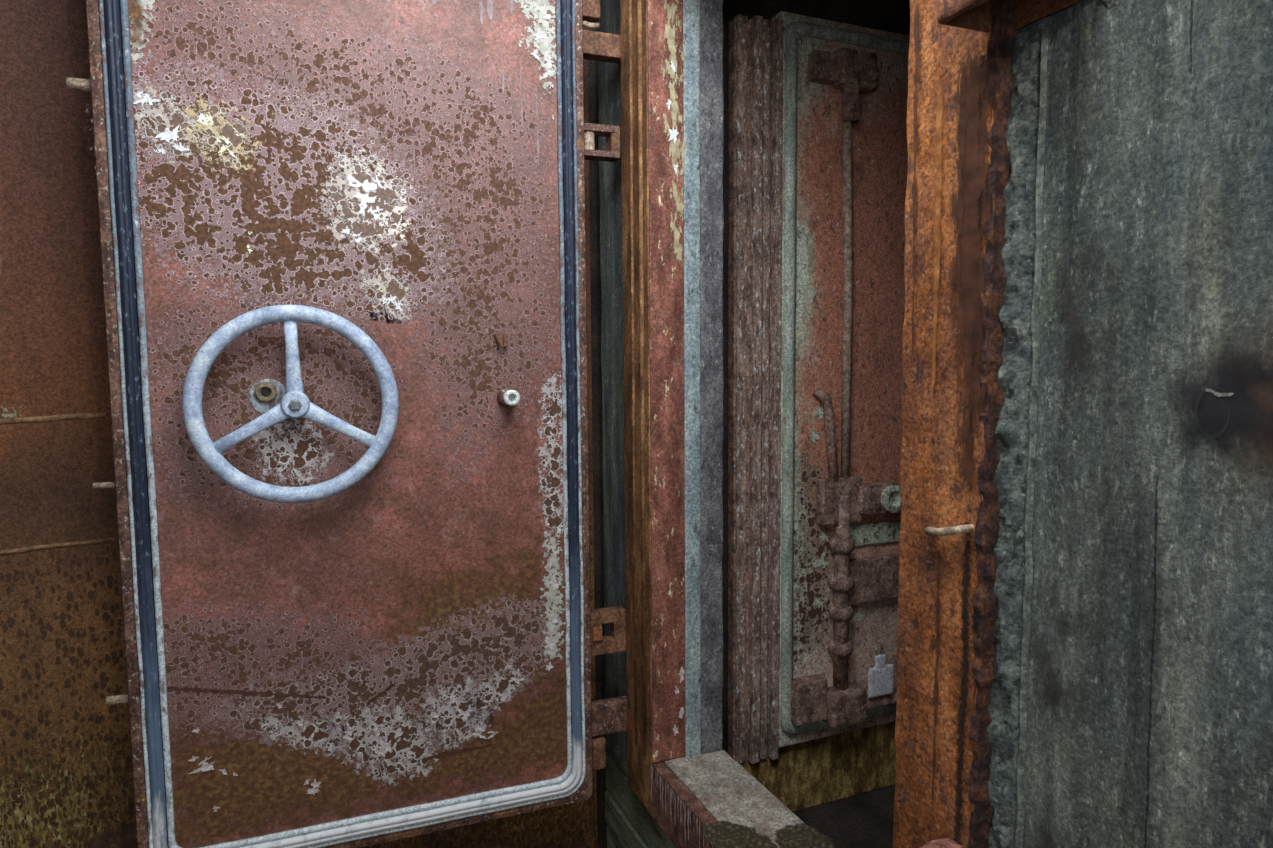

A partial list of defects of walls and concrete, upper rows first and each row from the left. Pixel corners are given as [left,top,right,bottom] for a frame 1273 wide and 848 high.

peeling [124,0,458,337]
rust [120,0,560,519]
peeling [514,0,557,94]
rust [911,6,920,352]
rust [932,46,996,499]
peeling [304,779,321,794]
rust [155,538,567,846]
peeling [189,372,568,786]
rust [931,553,942,810]